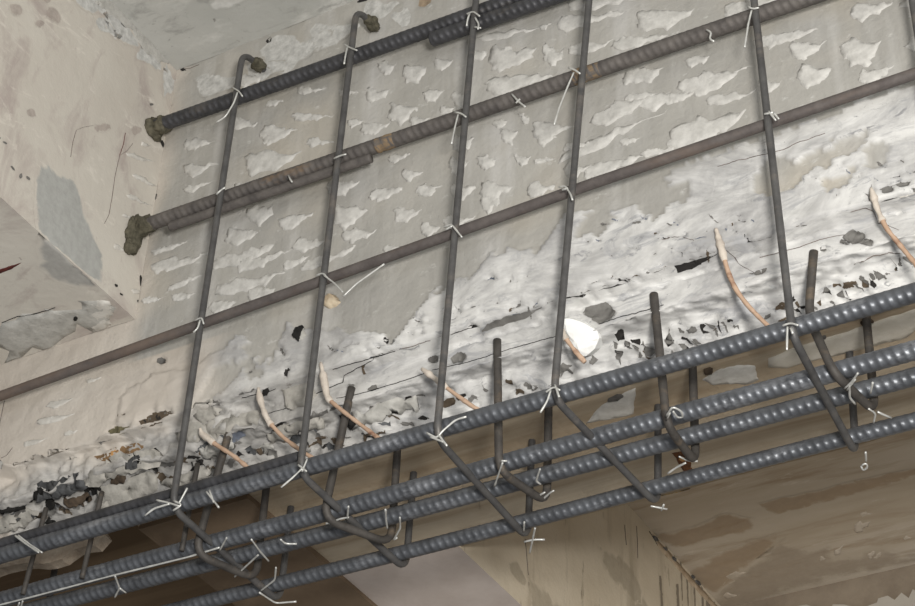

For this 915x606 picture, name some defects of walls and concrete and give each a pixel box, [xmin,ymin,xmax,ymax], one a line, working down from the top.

corrosion [373,133,396,153]
spalling [866,160,915,202]
spalling [115,135,513,314]
spalling [840,229,873,246]
spalling [0,300,116,363]
spalling [291,325,307,342]
spalling [437,301,553,338]
peeling [564,237,718,365]
spalling [665,319,739,353]
spalling [764,256,913,322]
peeling [768,309,915,368]
spalling [0,383,429,534]